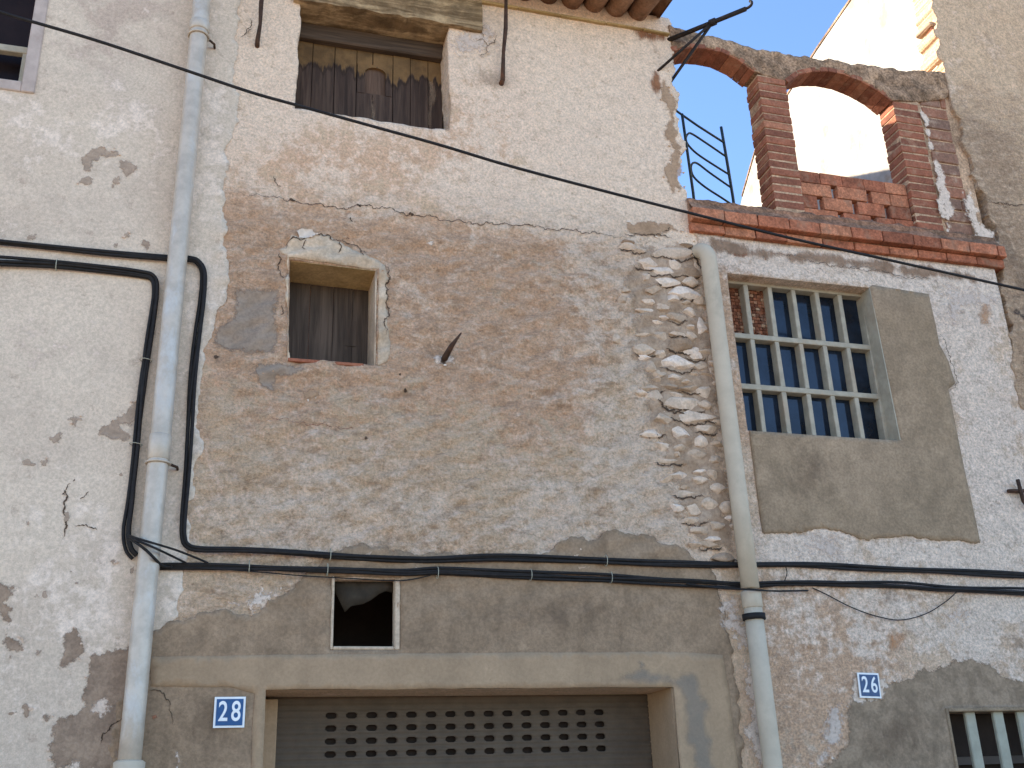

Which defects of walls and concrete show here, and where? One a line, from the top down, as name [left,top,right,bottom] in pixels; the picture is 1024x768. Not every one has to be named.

peeling [77,146,137,188]
flaking render [660,70,686,193]
leakage [920,109,994,238]
crack [237,177,701,334]
flaking render [624,221,733,552]
crack [62,479,97,536]
peeling [0,583,14,623]
peeling [3,636,24,658]
peeling [9,627,129,768]
peeling [824,658,1024,768]